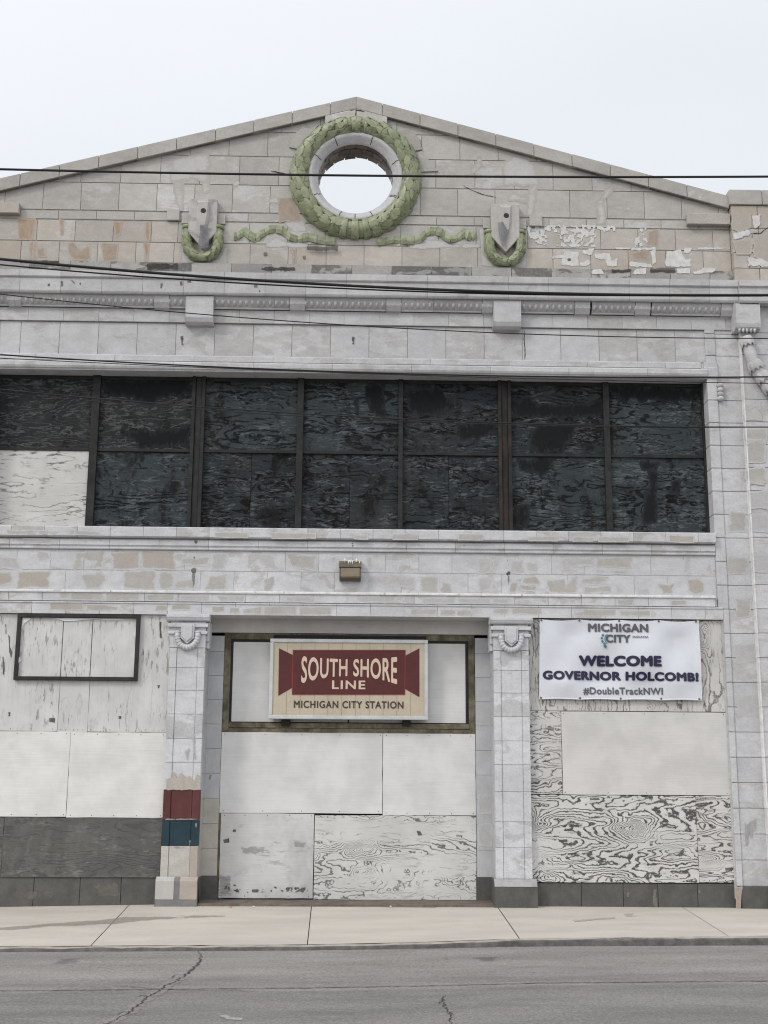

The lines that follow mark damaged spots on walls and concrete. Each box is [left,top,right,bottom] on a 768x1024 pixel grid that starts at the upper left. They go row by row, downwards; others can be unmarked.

peeling [552,225,604,274]
peeling [615,228,656,275]
peeling [731,212,768,262]